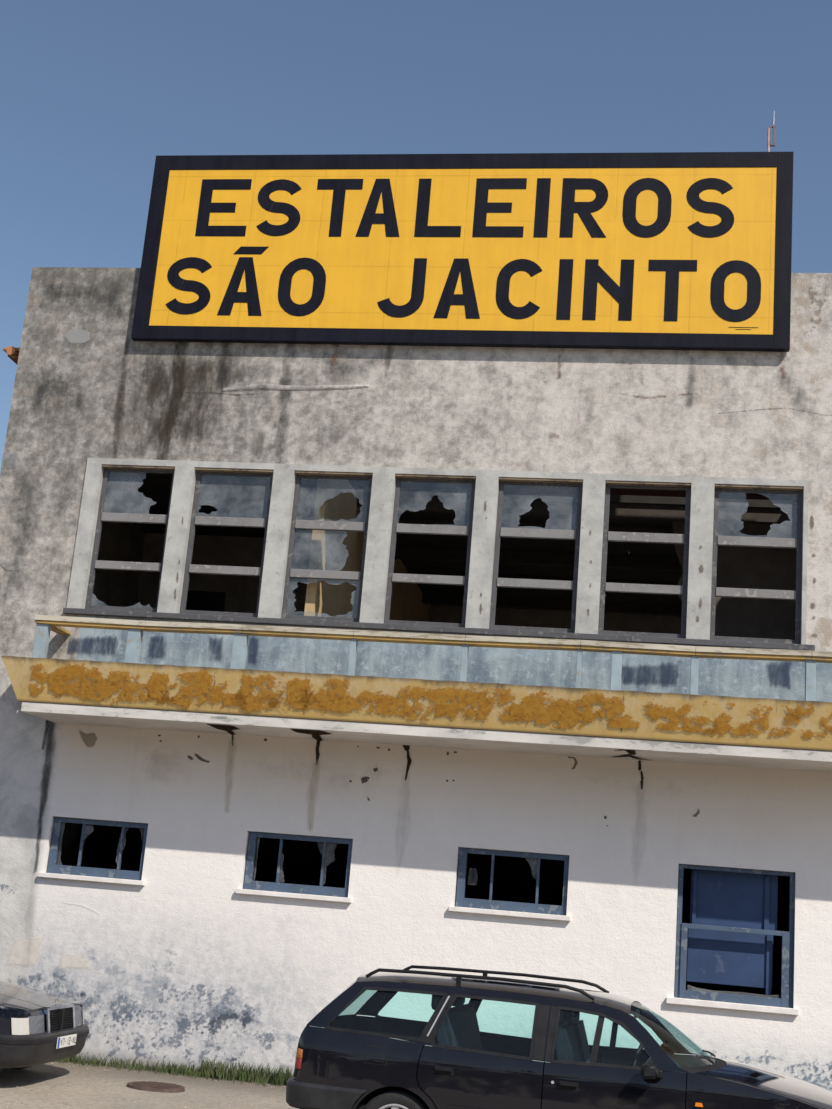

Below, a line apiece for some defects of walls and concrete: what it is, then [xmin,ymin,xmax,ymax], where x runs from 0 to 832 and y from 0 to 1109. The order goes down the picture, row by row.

leakage [147,342,231,460]
crack [207,673,239,745]
peeling [29,663,832,739]
leakage [34,720,55,871]
crack [291,729,330,765]
crack [402,745,412,780]
crack [614,728,645,790]
peeling [9,965,292,1064]
peeling [690,1050,832,1089]